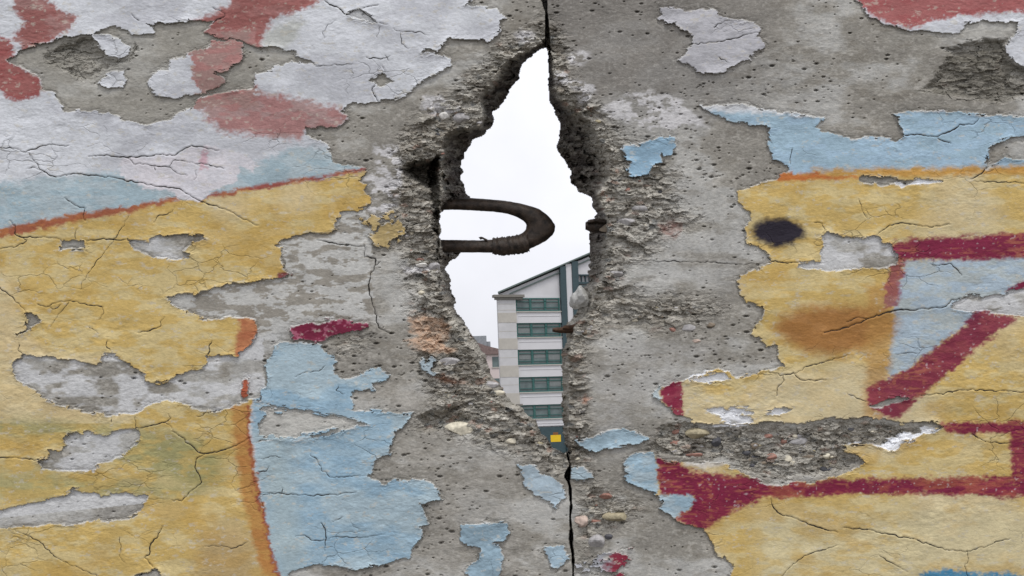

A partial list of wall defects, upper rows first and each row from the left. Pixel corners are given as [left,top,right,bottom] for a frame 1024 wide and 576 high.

crack [541,0,550,48]
crack [0,144,252,349]
spalling [0,0,574,576]
crack [319,240,385,331]
peeling [547,0,1024,576]
crack [111,416,242,501]
crack [119,532,160,576]
crack [565,452,574,576]
crack [771,502,1009,576]